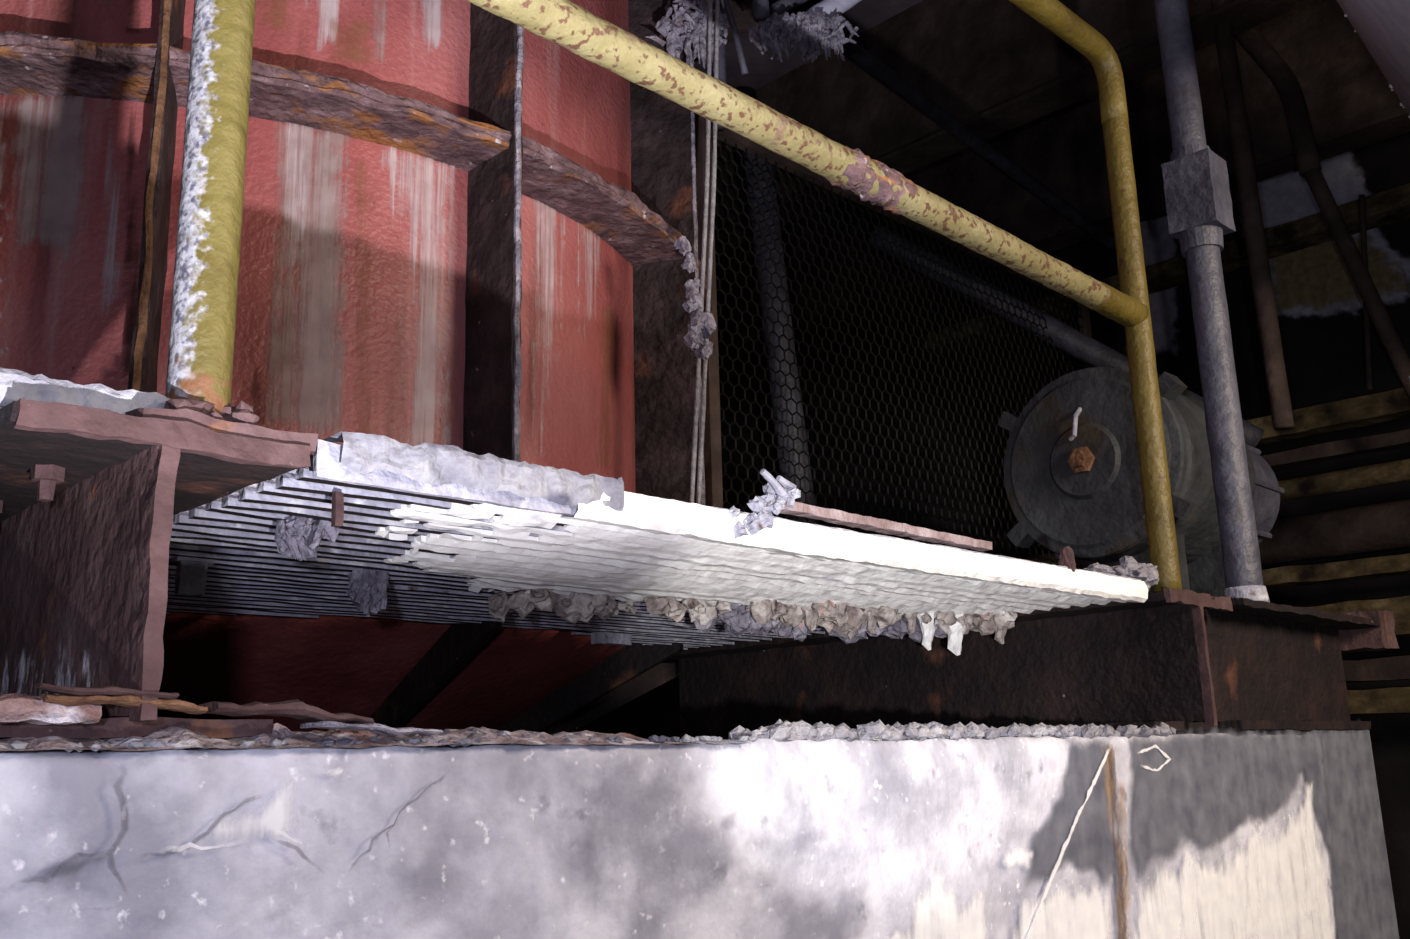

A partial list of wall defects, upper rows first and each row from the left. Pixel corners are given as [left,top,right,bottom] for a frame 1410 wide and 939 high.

rust [126,285,138,368]
damp [269,124,1148,656]
crack [178,842,220,851]
crack [276,831,300,843]
damp [1004,740,1116,939]
damp [1132,729,1399,939]